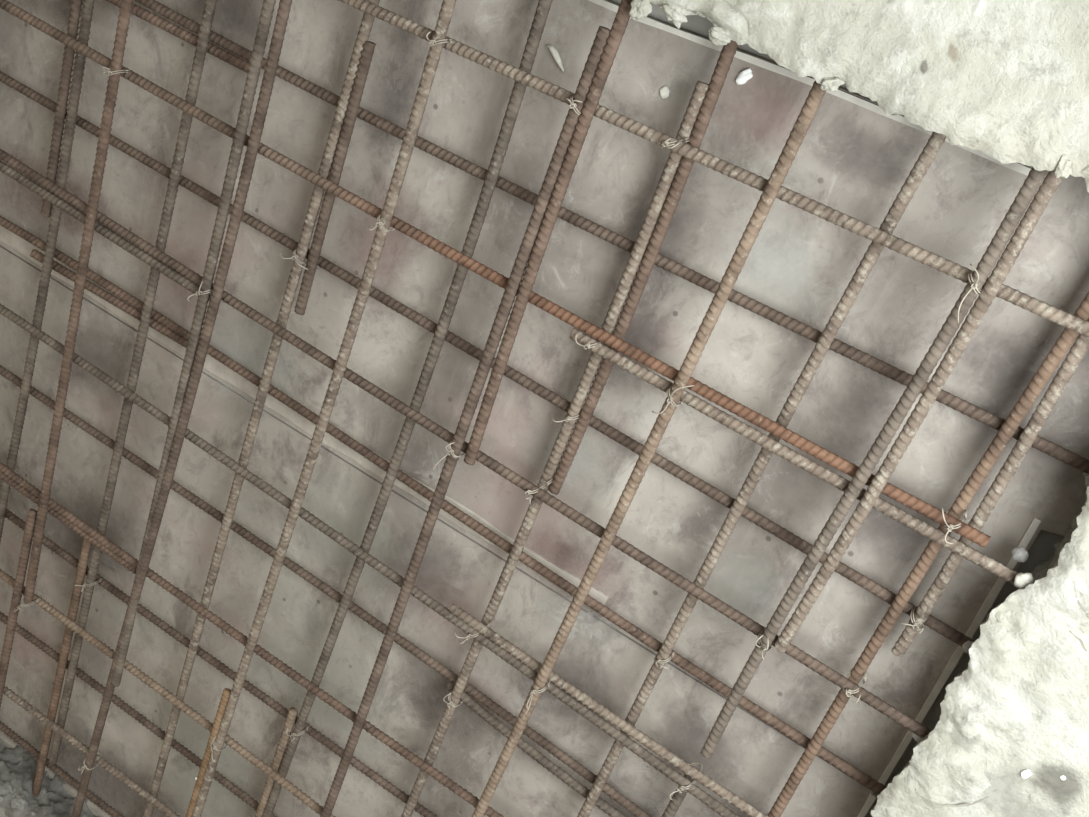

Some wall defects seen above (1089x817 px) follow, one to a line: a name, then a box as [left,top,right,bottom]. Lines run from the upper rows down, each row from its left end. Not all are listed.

spalling [185,0,509,817]
spalling [320,0,1089,817]
leakage [1037,766,1078,804]